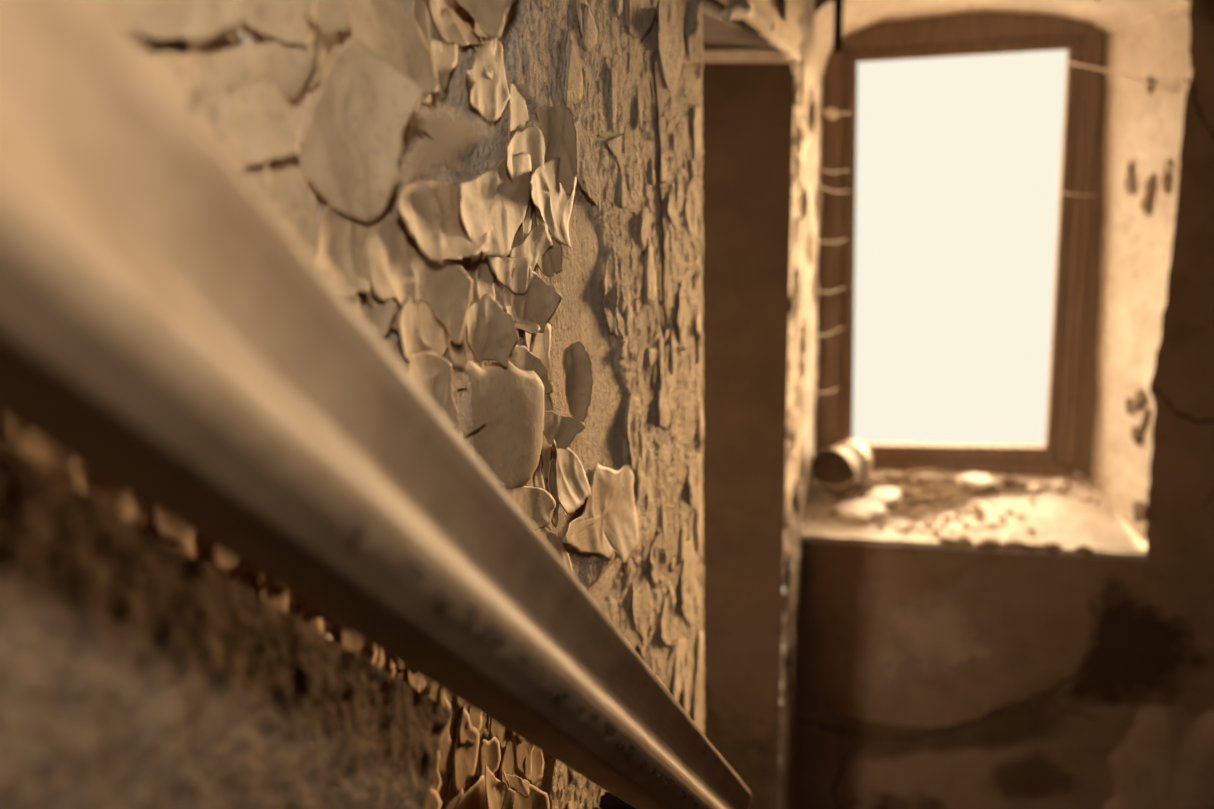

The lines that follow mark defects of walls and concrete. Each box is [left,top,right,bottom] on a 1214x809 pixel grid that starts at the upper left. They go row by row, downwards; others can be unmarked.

peeling [104,0,704,732]
leakage [1073,585,1199,703]
peeling [455,765,557,809]